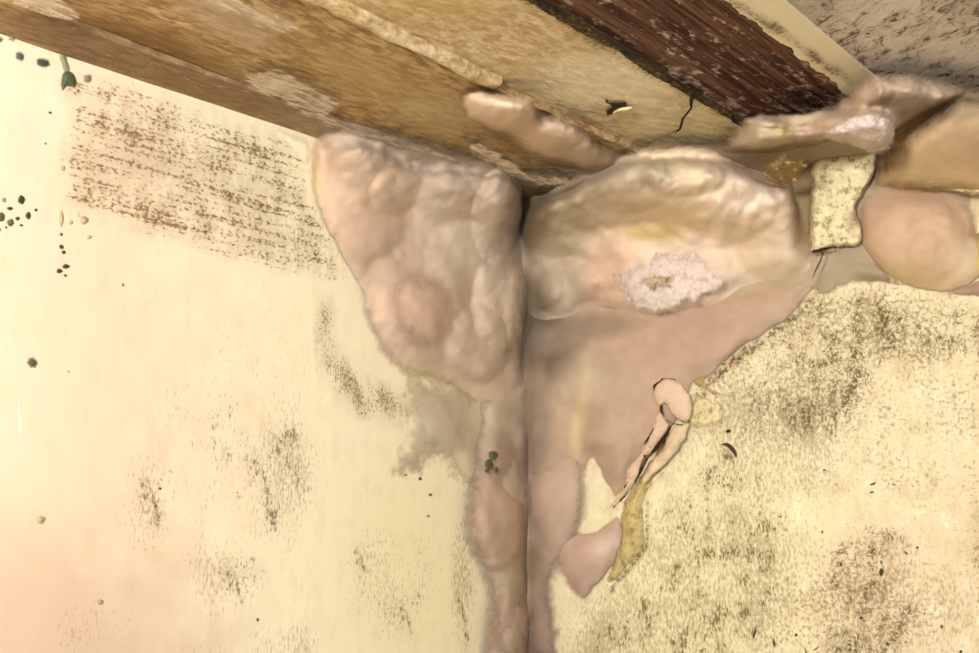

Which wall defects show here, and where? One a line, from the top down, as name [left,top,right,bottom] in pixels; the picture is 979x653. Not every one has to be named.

water stain [37,54,334,279]
crack [669,86,697,134]
water stain [702,293,979,440]
peeling [608,377,737,592]
water stain [594,460,790,653]
water stain [805,526,918,653]